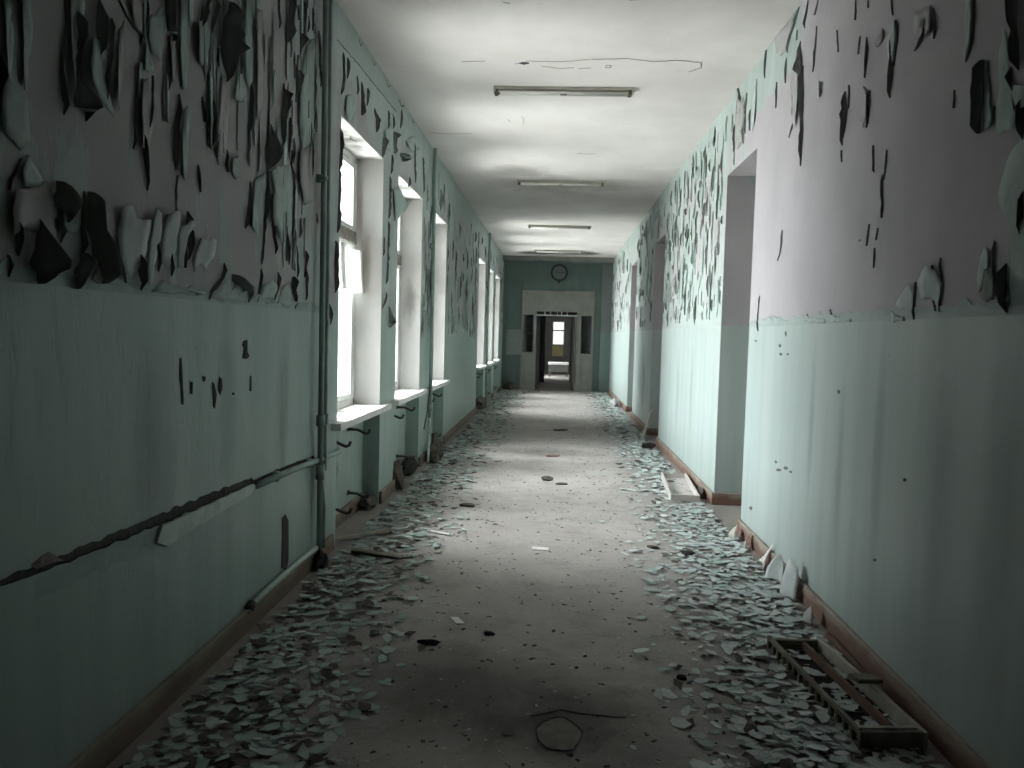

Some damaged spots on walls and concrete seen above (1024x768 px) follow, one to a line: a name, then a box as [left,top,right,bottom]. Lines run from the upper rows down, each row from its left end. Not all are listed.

crack [534,58,702,72]
peeling [0,0,504,339]
peeling [612,0,819,330]
peeling [749,0,1024,356]
peeling [179,358,235,408]
spalling [155,484,256,546]
spalling [281,514,289,570]
peeling [756,543,814,626]